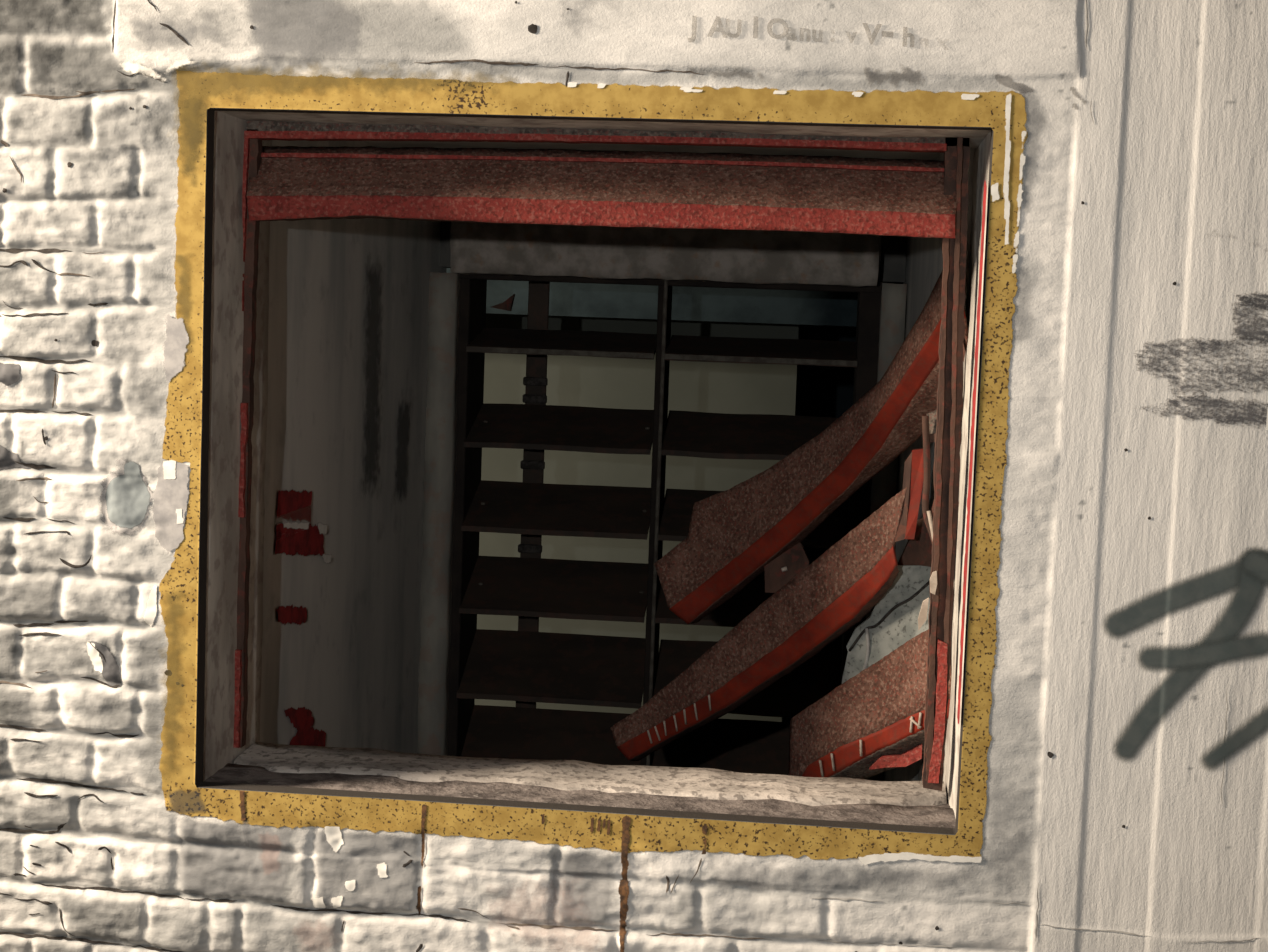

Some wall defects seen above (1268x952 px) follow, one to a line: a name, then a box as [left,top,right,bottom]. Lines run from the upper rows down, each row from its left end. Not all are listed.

peeling [152,460,189,553]
peeling [143,585,157,626]
corrosion [590,816,631,952]